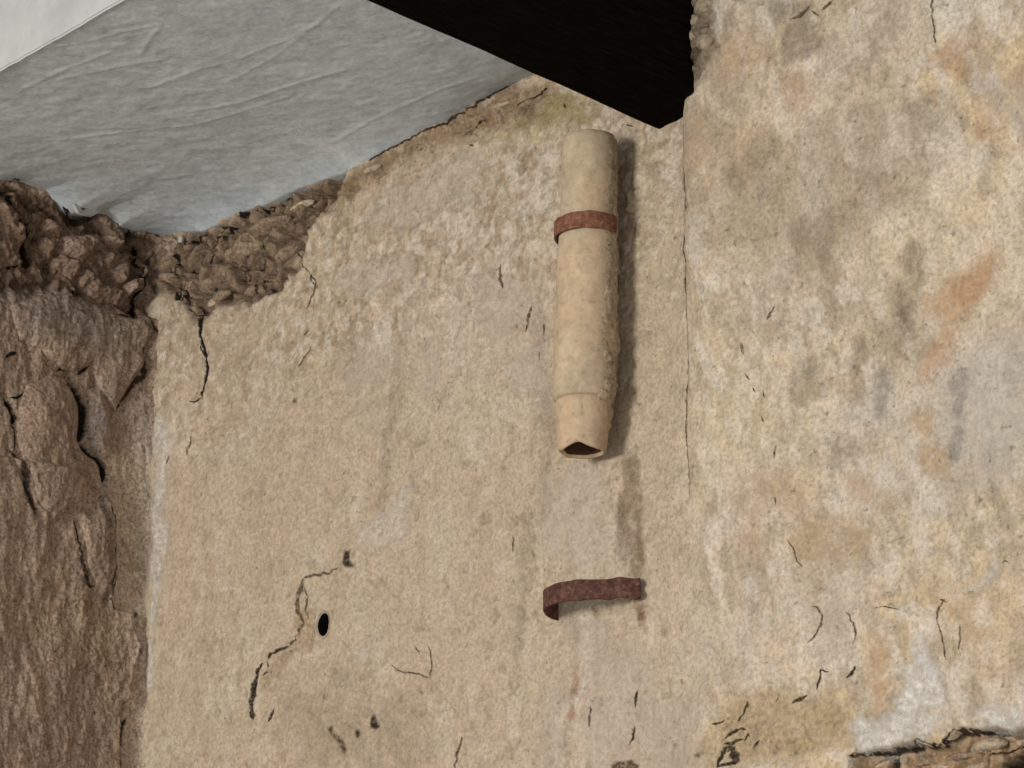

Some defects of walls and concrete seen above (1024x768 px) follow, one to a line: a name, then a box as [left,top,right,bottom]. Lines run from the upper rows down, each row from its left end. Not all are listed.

spalling [0,159,394,316]
crack [175,283,209,403]
crack [248,567,339,721]
crack [936,599,961,660]
crack [713,701,748,725]
crack [776,666,855,704]
spalling [866,737,1024,768]